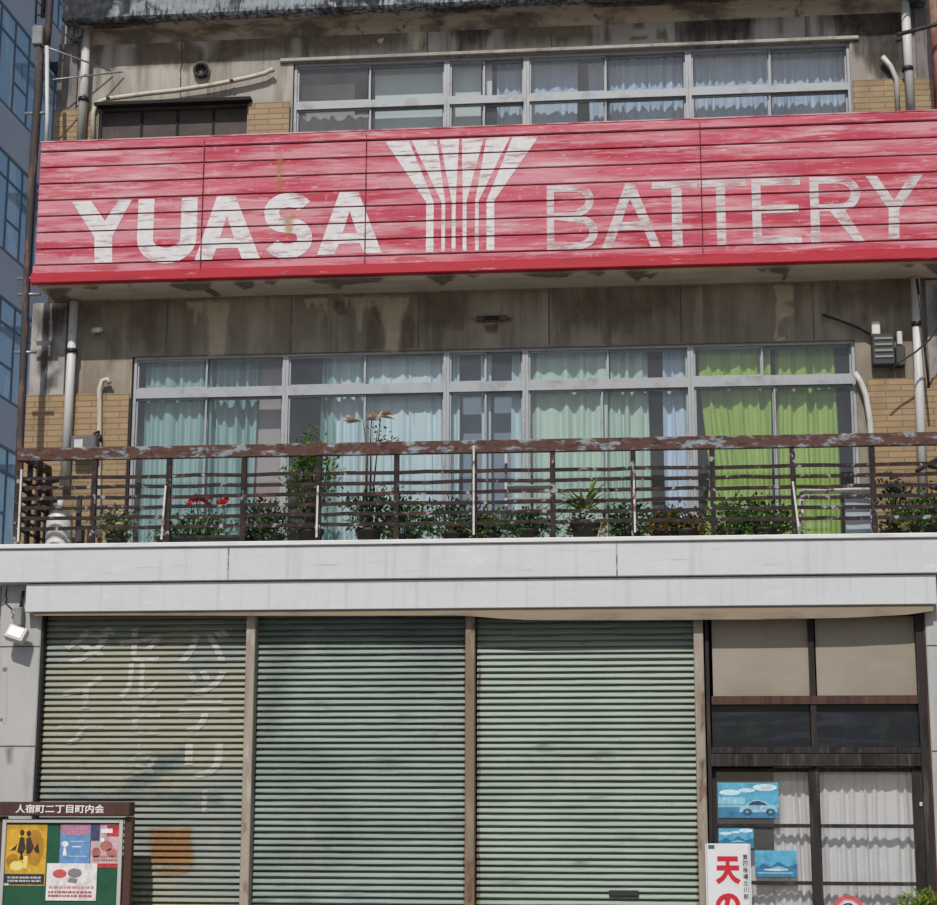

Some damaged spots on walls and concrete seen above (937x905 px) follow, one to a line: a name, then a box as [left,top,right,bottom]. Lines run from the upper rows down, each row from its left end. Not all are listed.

mould [433,6,498,14]
damp [135,37,291,67]
damp [302,33,401,51]
damp [38,307,68,335]
damp [304,296,413,352]
damp [39,350,54,388]